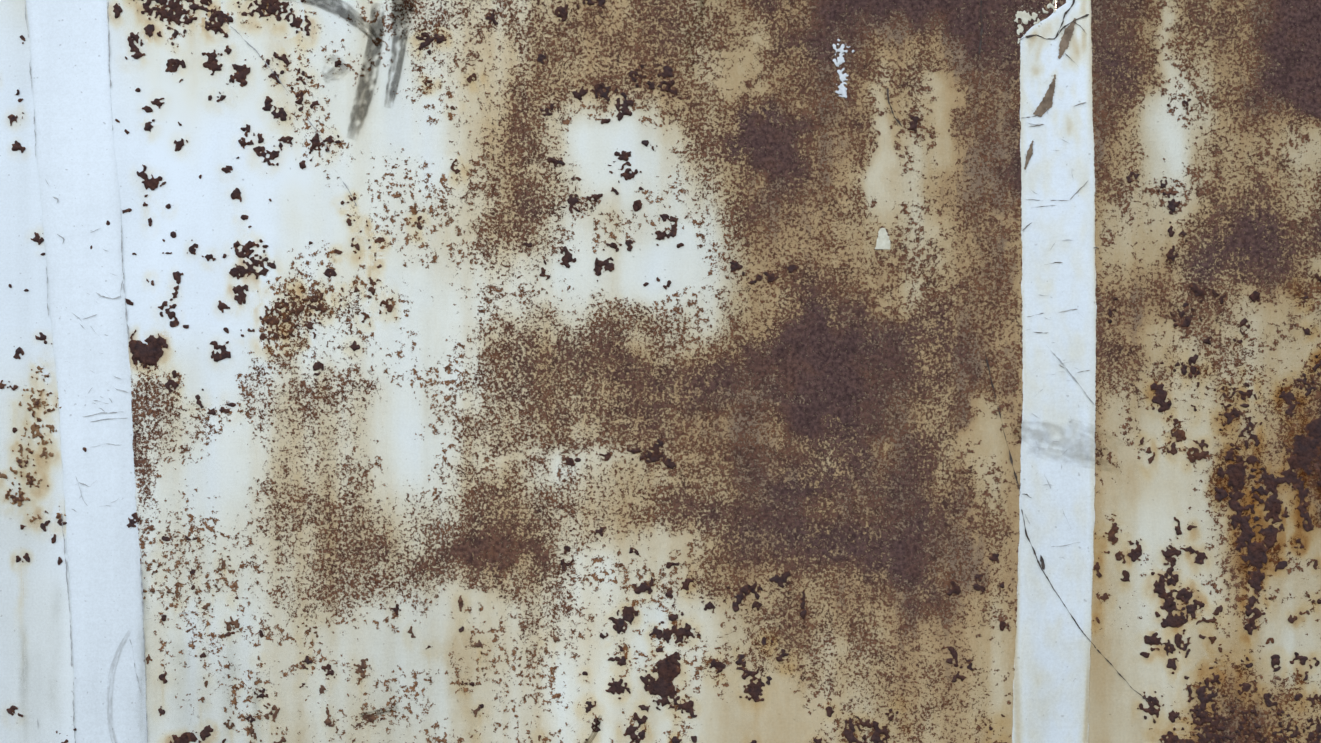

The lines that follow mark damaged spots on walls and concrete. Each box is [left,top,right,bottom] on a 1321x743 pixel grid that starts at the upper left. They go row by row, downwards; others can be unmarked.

corrosion [0,347,67,565]
corrosion [106,0,1066,743]
corrosion [1091,0,1321,743]